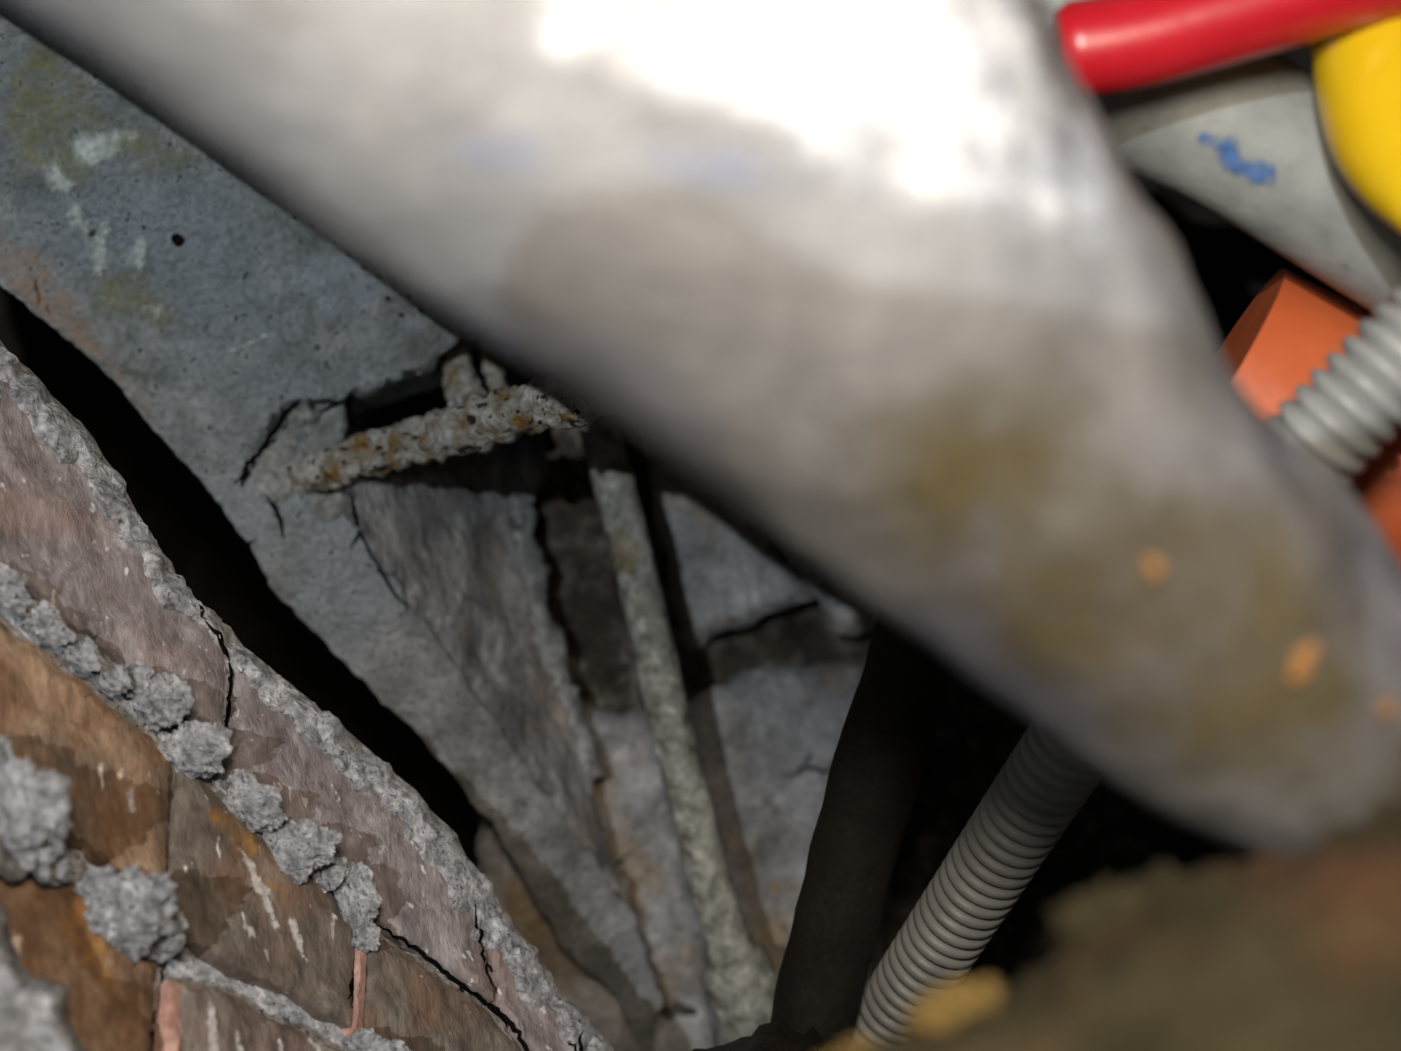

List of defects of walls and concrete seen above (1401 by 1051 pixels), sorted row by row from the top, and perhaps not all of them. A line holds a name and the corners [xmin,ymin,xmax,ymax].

crack [234,397,355,545]
spalling [249,324,603,524]